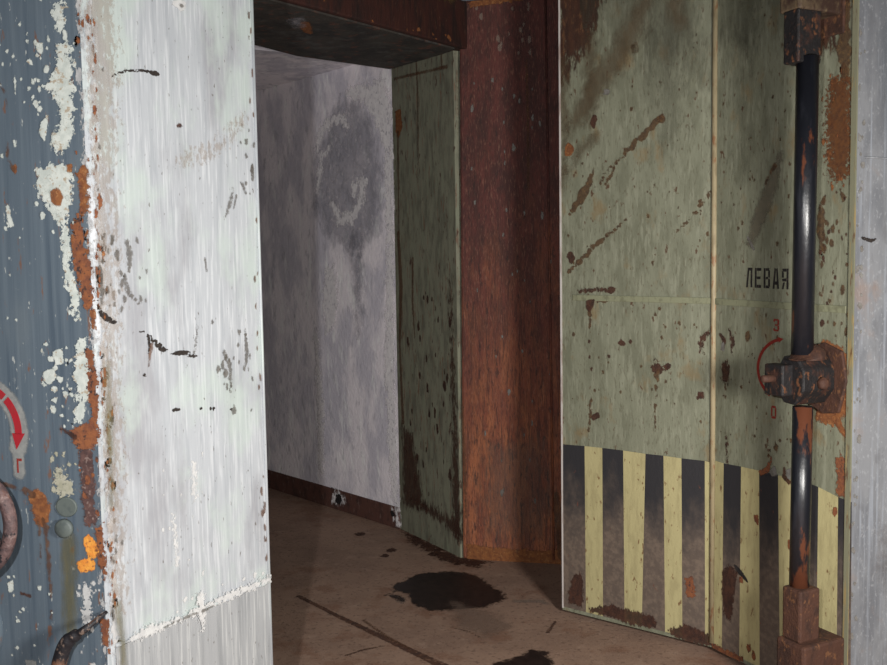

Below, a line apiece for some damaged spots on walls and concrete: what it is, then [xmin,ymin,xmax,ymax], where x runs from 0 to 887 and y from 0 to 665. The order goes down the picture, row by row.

corrosion [76,13,104,74]
corrosion [560,0,607,87]
peeling [14,0,82,322]
corrosion [569,114,665,216]
corrosion [817,0,852,268]
peeling [4,205,14,231]
corrosion [395,109,562,569]
corrosion [60,348,125,664]
damp [384,571,505,611]
damp [492,649,554,665]
corrosion [589,603,657,628]
corrosion [668,623,744,662]